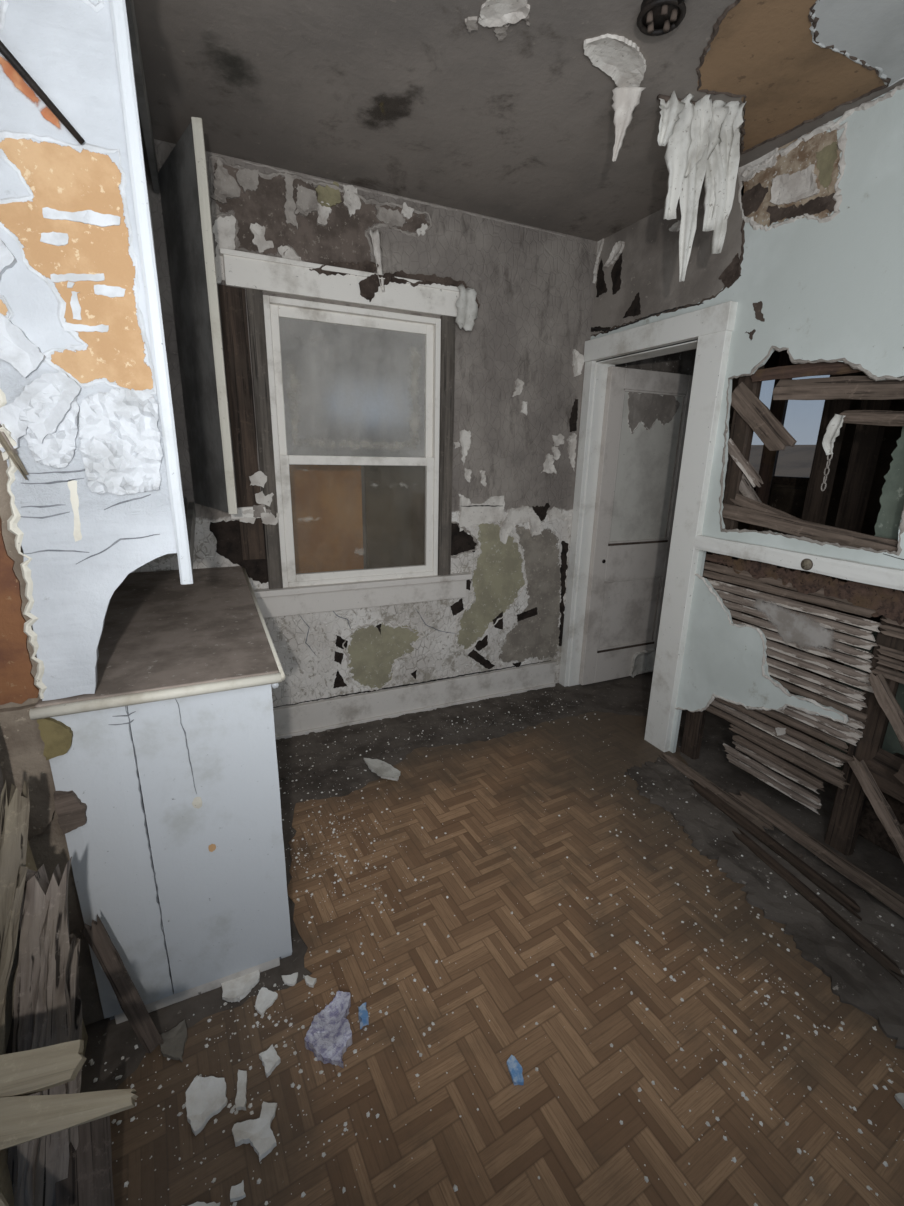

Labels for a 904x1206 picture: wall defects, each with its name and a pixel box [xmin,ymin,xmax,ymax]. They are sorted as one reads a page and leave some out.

peeling [465,0,530,42]
peeling [584,33,904,288]
peeling [208,155,480,331]
spalling [593,238,625,297]
crack [20,469,85,519]
crack [104,494,151,510]
peeling [453,429,487,486]
peeling [541,399,578,474]
crack [24,534,160,564]
peeling [450,503,569,669]
peeling [333,619,425,692]
spalling [675,574,848,724]